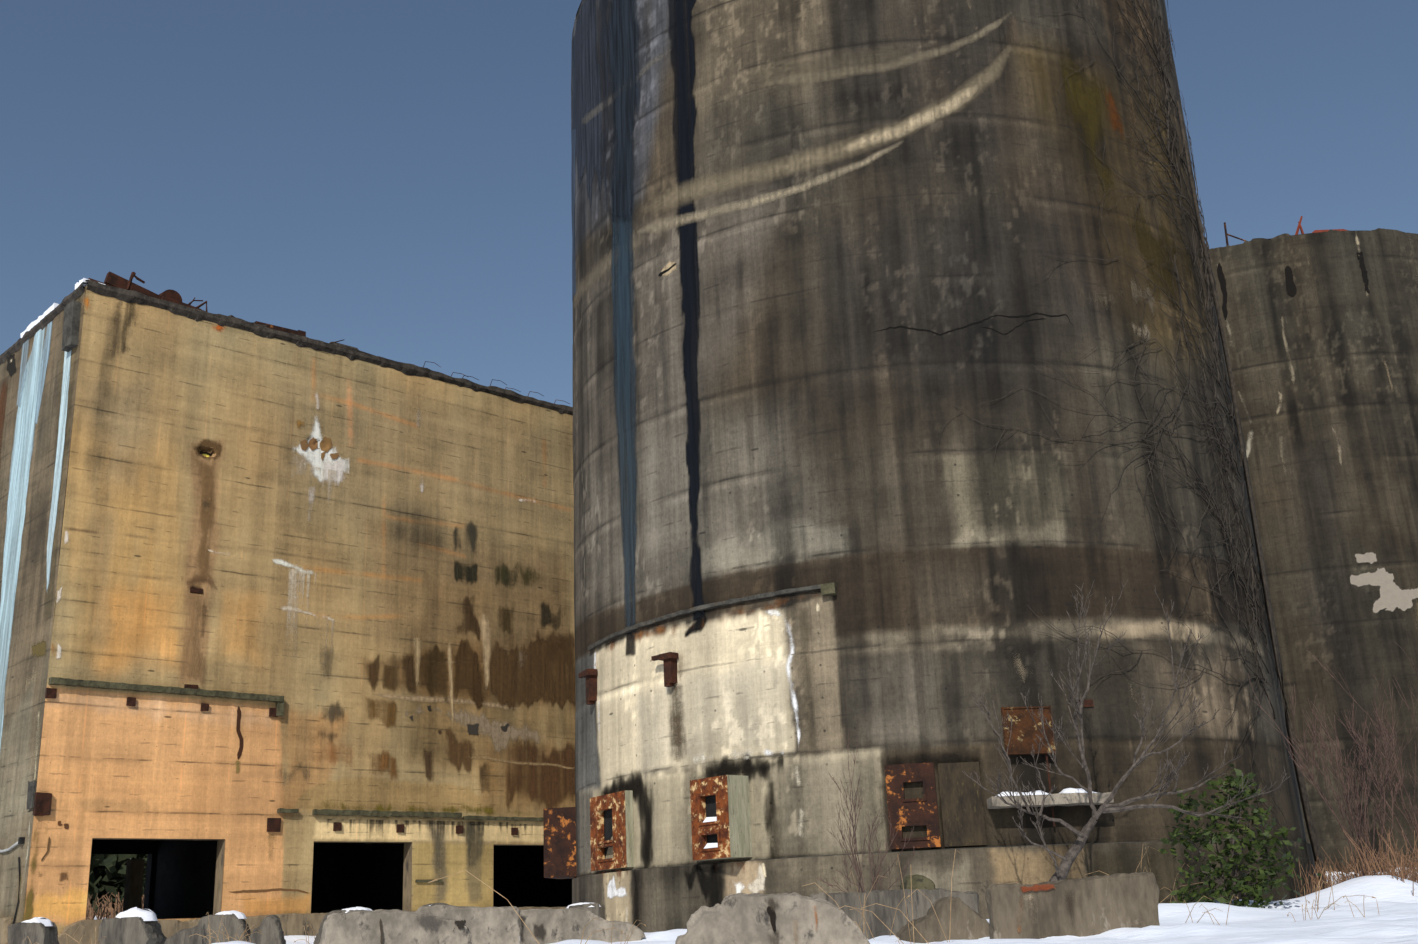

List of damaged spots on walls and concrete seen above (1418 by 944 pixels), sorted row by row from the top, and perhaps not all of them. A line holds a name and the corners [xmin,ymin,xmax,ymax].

damp [739,176,828,206]
damp [571,0,707,655]
crack [1217,263,1231,335]
crack [1356,236,1370,293]
crack [1246,266,1297,472]
rust [187,465,214,584]
peeling [1350,552,1418,613]
crack [235,706,243,773]